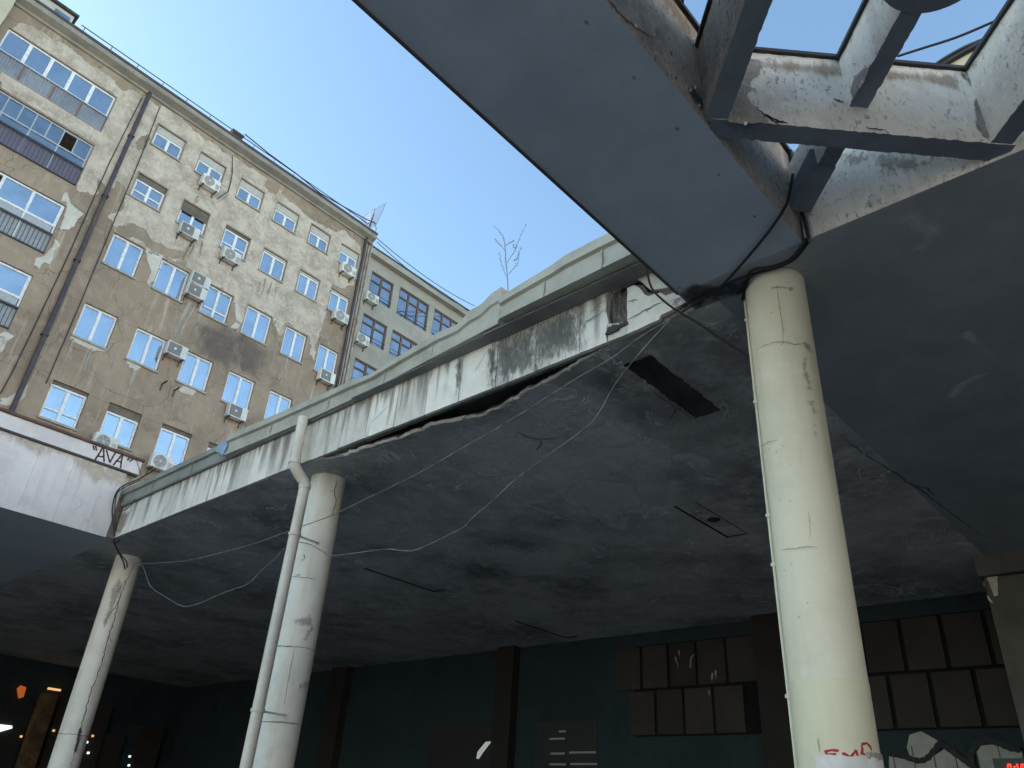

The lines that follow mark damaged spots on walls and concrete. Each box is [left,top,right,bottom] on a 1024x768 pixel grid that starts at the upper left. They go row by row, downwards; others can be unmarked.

peeling [728,58,768,125]
spalling [850,65,869,97]
peeling [975,99,990,137]
peeling [0,22,361,361]
damp [488,304,582,386]
crack [757,291,810,351]
crack [58,566,134,763]
crack [262,645,314,727]